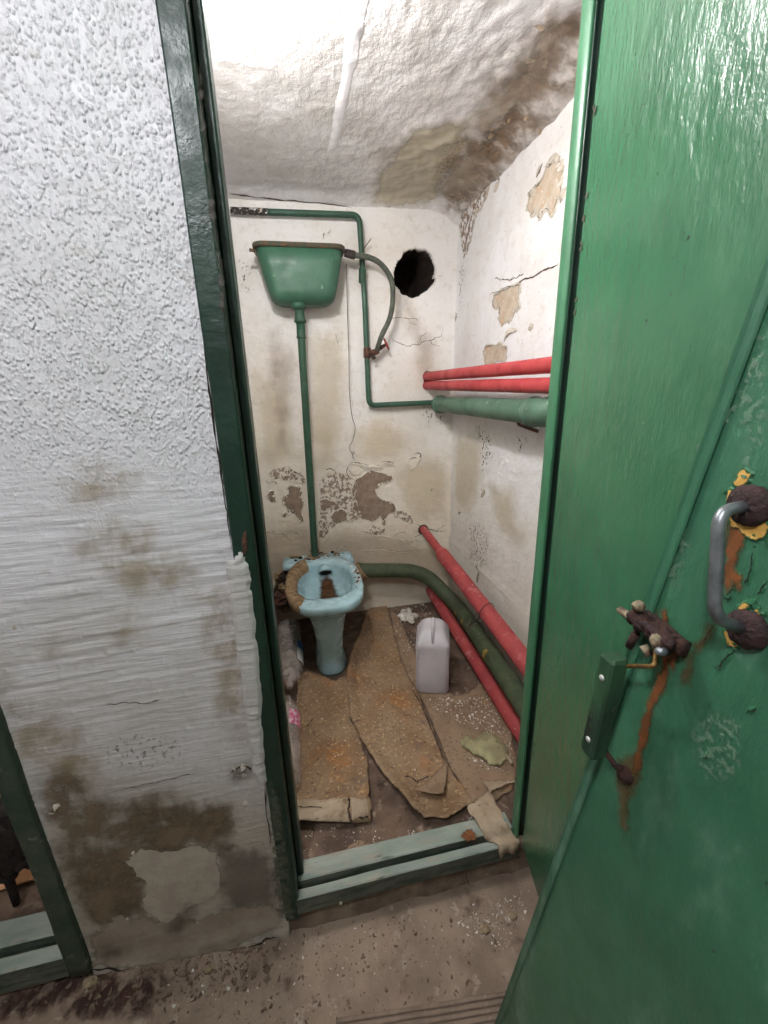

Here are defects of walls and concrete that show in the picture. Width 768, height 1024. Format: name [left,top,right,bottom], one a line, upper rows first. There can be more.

damp [378,18,578,204]
peeling [447,116,548,257]
peeling [525,155,565,222]
peeling [492,282,521,327]
crack [491,263,559,294]
peeling [483,342,508,365]
peeling [265,467,307,524]
peeling [318,470,416,541]
damp [42,773,277,923]